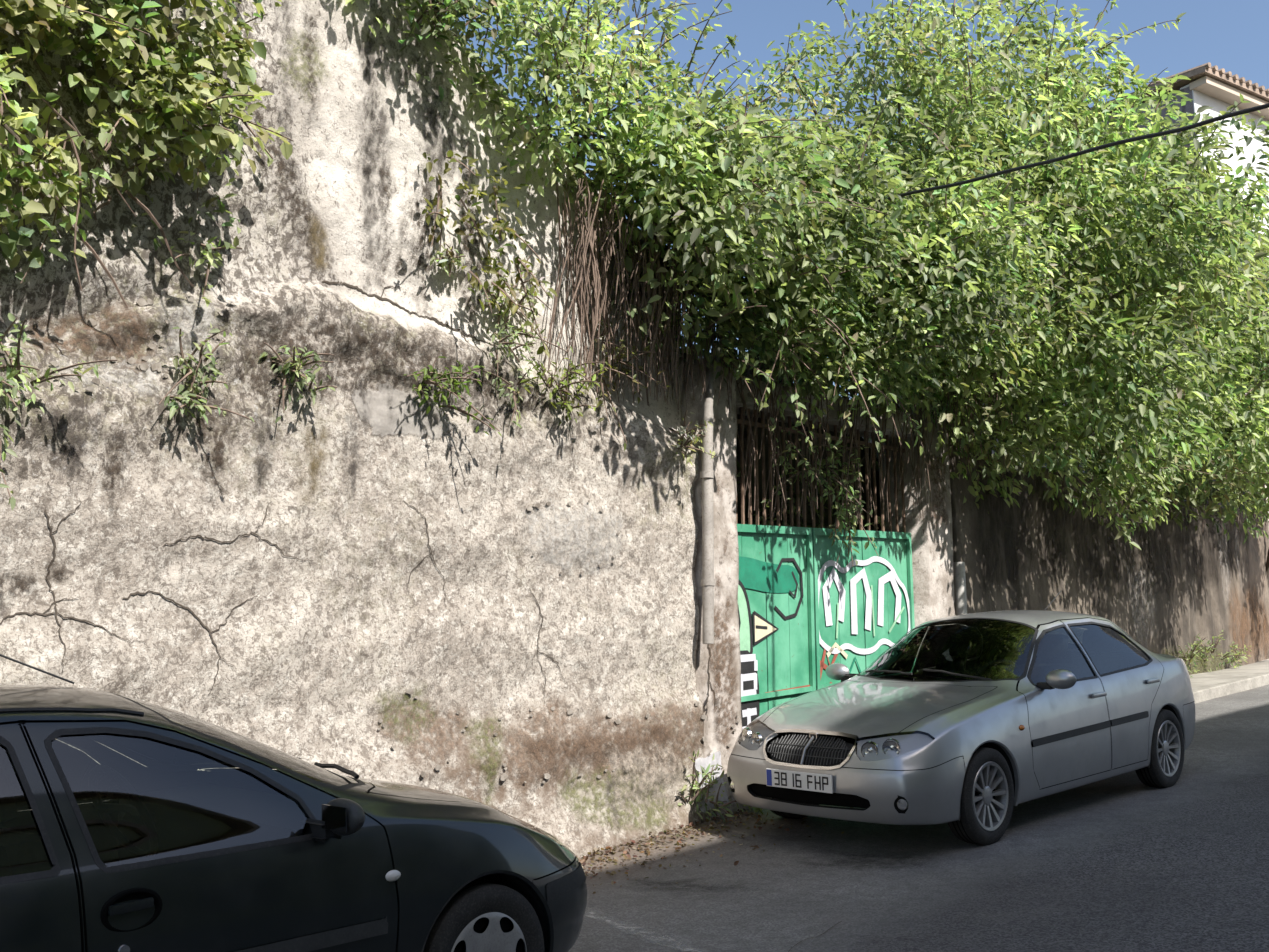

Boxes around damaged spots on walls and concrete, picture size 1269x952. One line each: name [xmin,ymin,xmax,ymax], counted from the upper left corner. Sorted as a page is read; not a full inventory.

leakage [277,0,317,107]
leakage [361,0,475,277]
leakage [312,221,326,266]
crack [322,280,522,359]
leakage [103,444,123,489]
leakage [194,400,231,493]
leakage [307,432,325,470]
leakage [349,418,367,484]
crack [0,498,146,673]
crack [164,501,313,561]
crack [403,500,446,605]
crack [123,590,258,695]